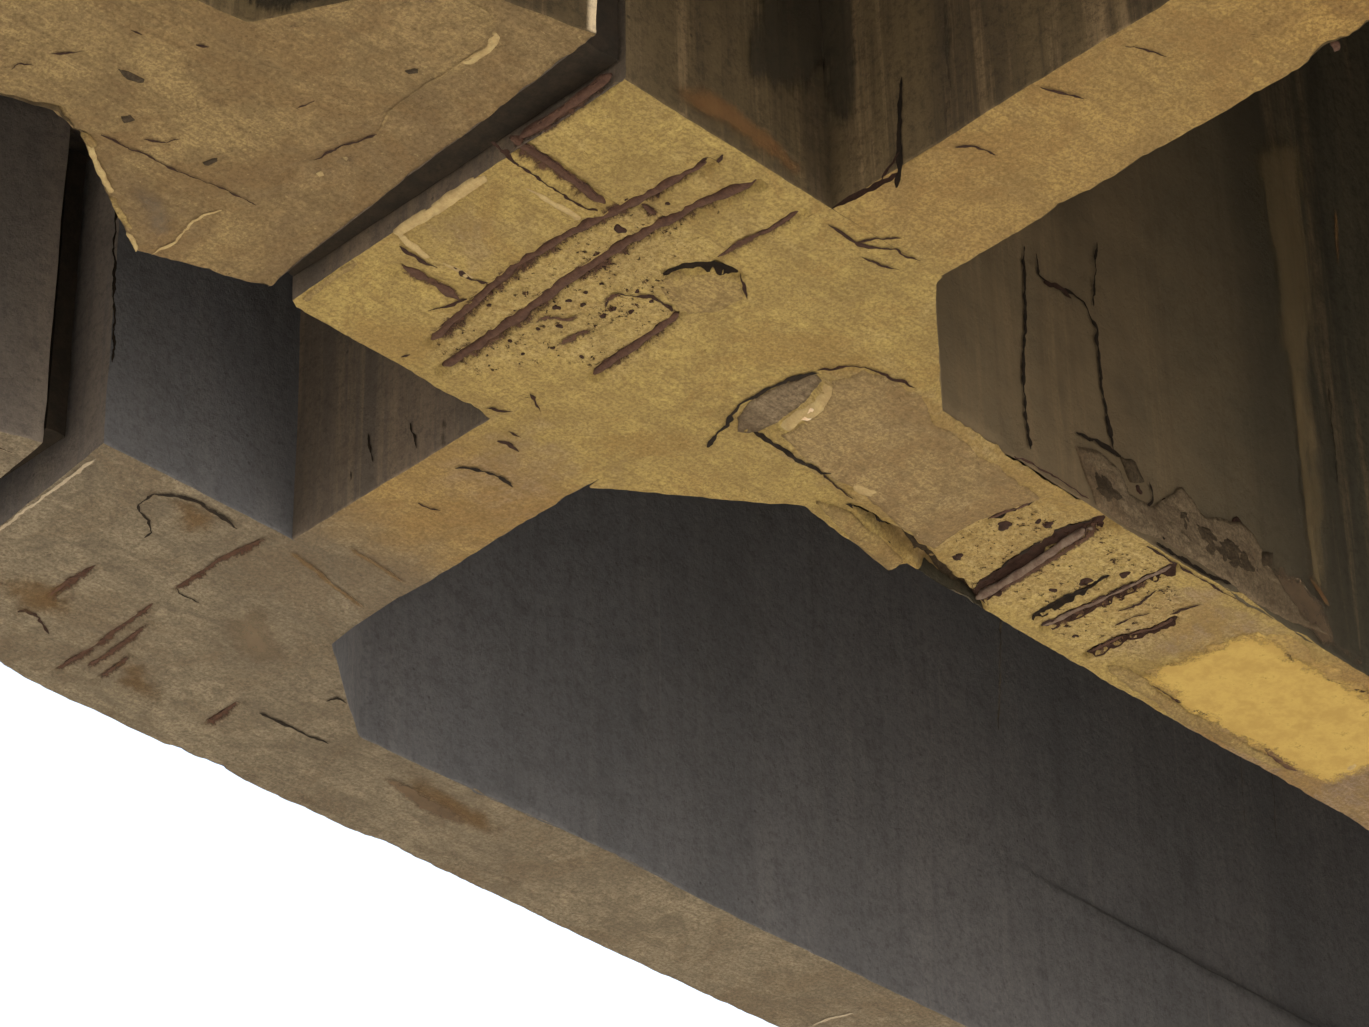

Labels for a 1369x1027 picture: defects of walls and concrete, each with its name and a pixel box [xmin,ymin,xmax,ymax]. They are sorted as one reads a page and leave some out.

crack [101,135,255,205]
crack [829,77,920,270]
spalling [393,73,756,367]
crack [111,212,119,362]
spalling [302,260,358,302]
rust [399,246,489,301]
spalling [579,211,798,375]
rust [536,316,591,345]
crack [1014,244,1114,499]
crack [137,494,237,538]
crack [260,713,328,744]
peeling [1209,721,1298,771]